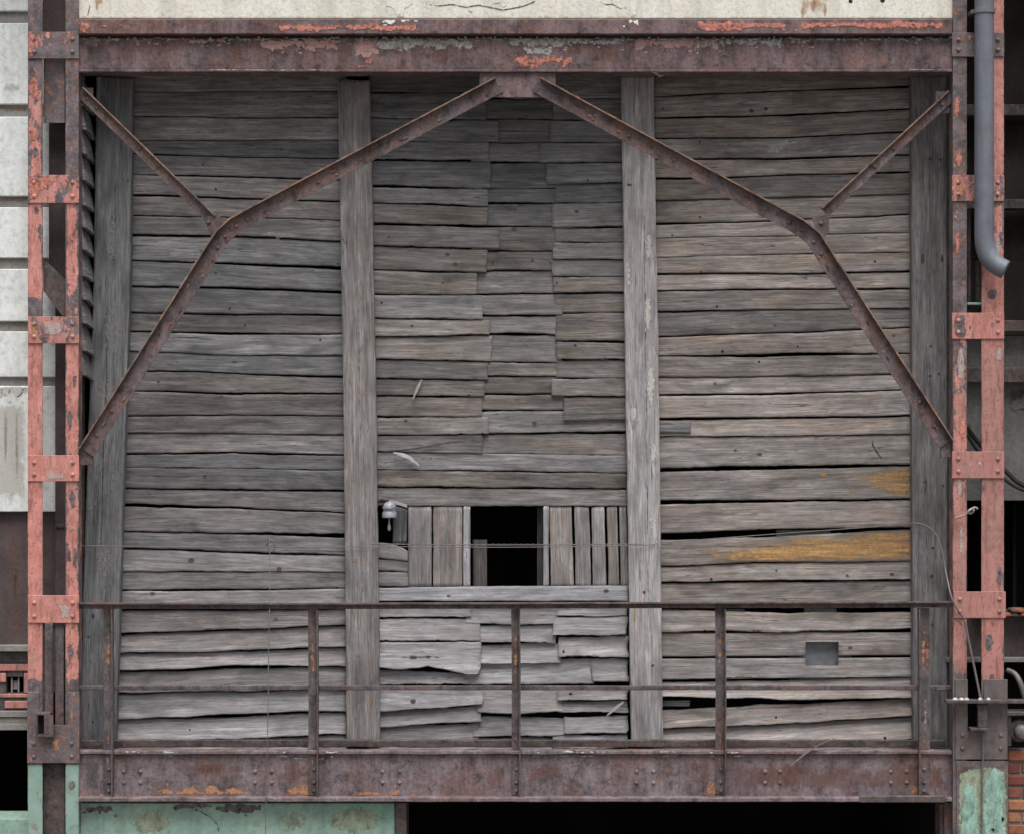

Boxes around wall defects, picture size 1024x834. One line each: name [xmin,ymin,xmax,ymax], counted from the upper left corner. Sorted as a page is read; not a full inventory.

crack [435,1,535,13]
peeling [79,0,946,69]
corrosion [156,765,248,795]
peeling [958,768,1007,834]